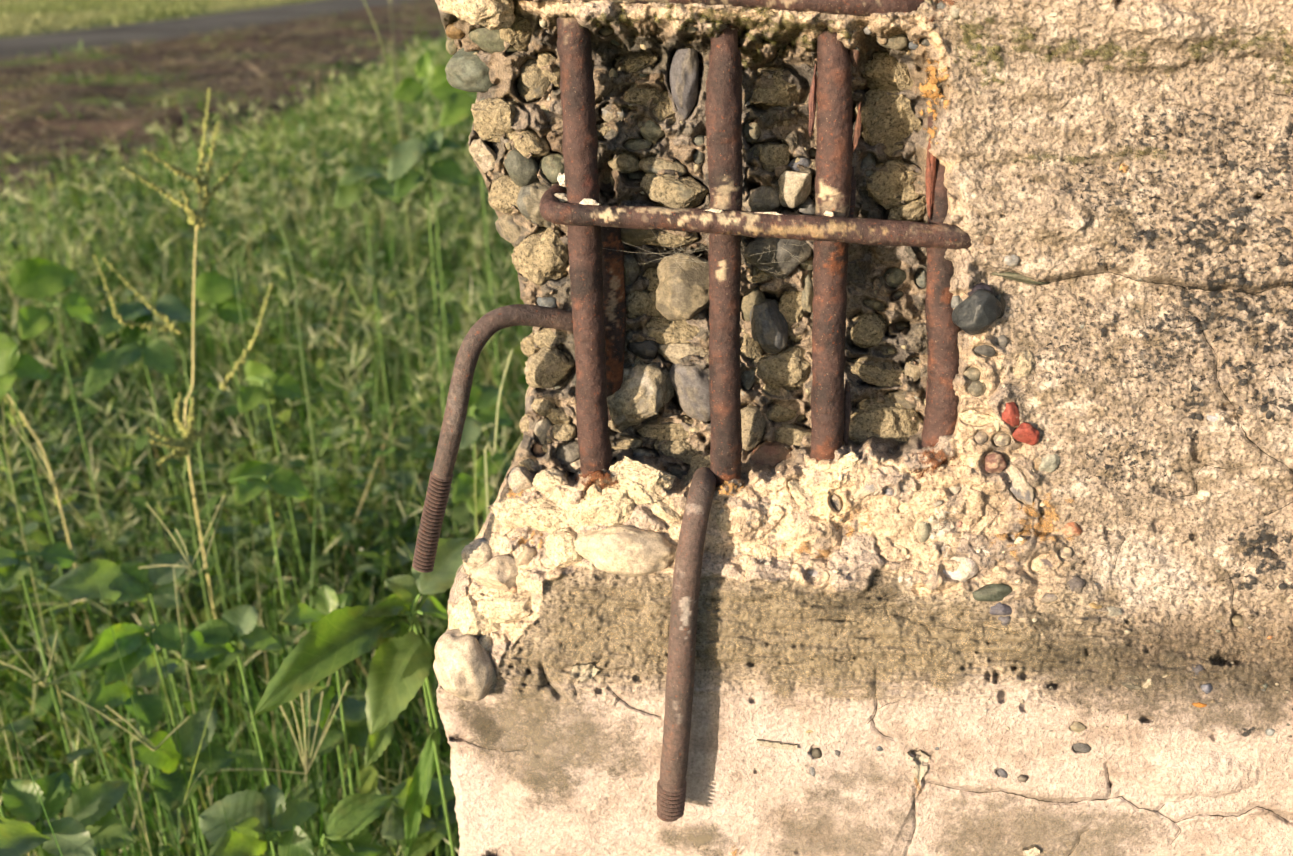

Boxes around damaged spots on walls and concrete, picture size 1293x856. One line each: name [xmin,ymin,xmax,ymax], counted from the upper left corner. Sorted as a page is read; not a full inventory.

rust [808,64,817,137]
rust [848,43,860,67]
rust [849,102,861,218]
rust [919,58,951,219]
spalling [435,0,1083,615]
crack [1035,263,1293,515]
rust [512,530,544,549]
spalling [433,228,711,701]
rust [575,469,619,506]
rust [715,480,747,496]
rust [911,445,958,479]
crack [808,652,1293,856]